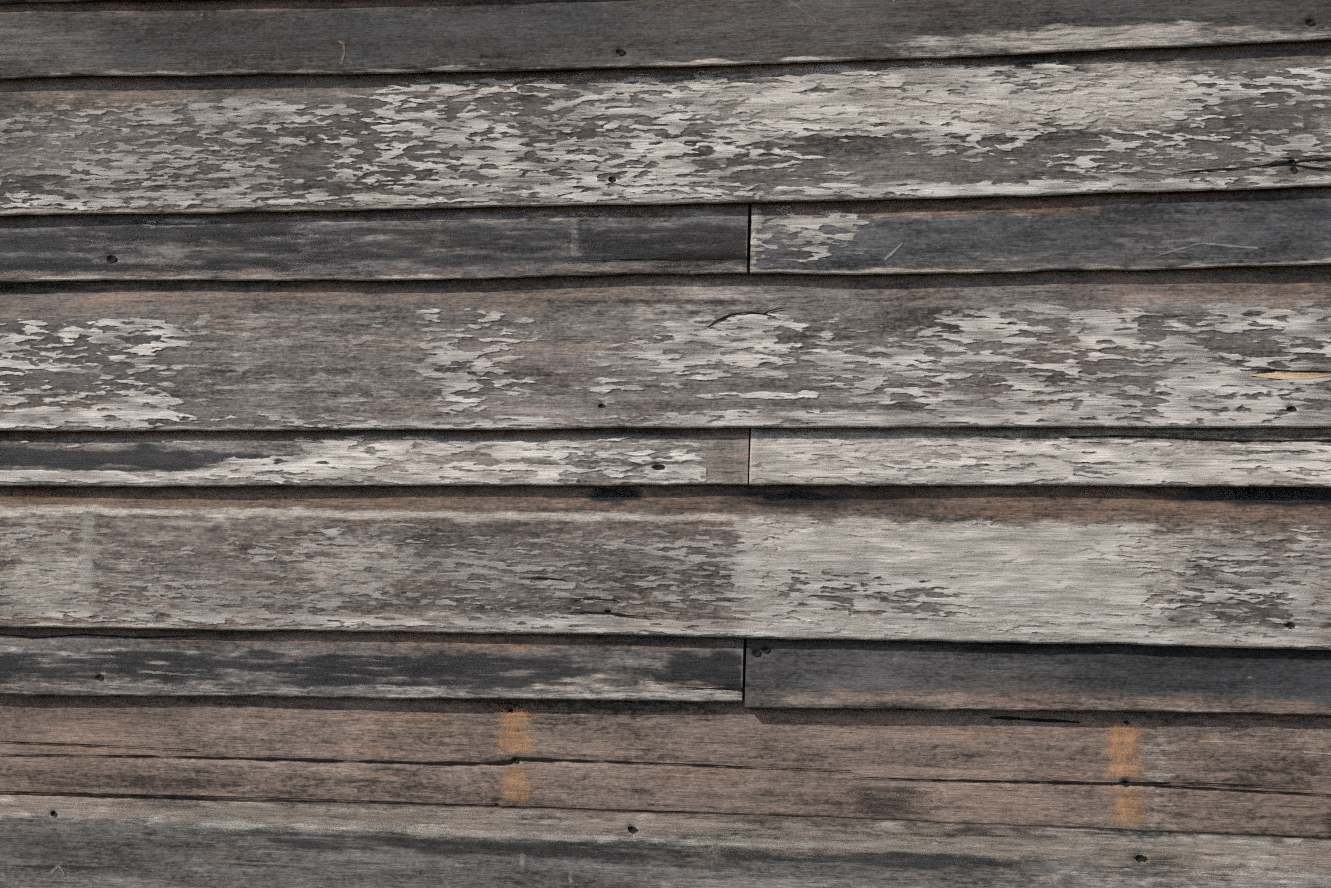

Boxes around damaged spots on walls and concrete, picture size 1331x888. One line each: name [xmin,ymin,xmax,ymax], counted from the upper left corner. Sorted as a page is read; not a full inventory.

peeling [1027,21,1197,44]
peeling [0,61,1331,262]
crack [1173,157,1331,174]
peeling [0,303,1331,486]
peeling [0,517,1331,647]
crack [0,741,1331,795]
crack [0,791,742,814]